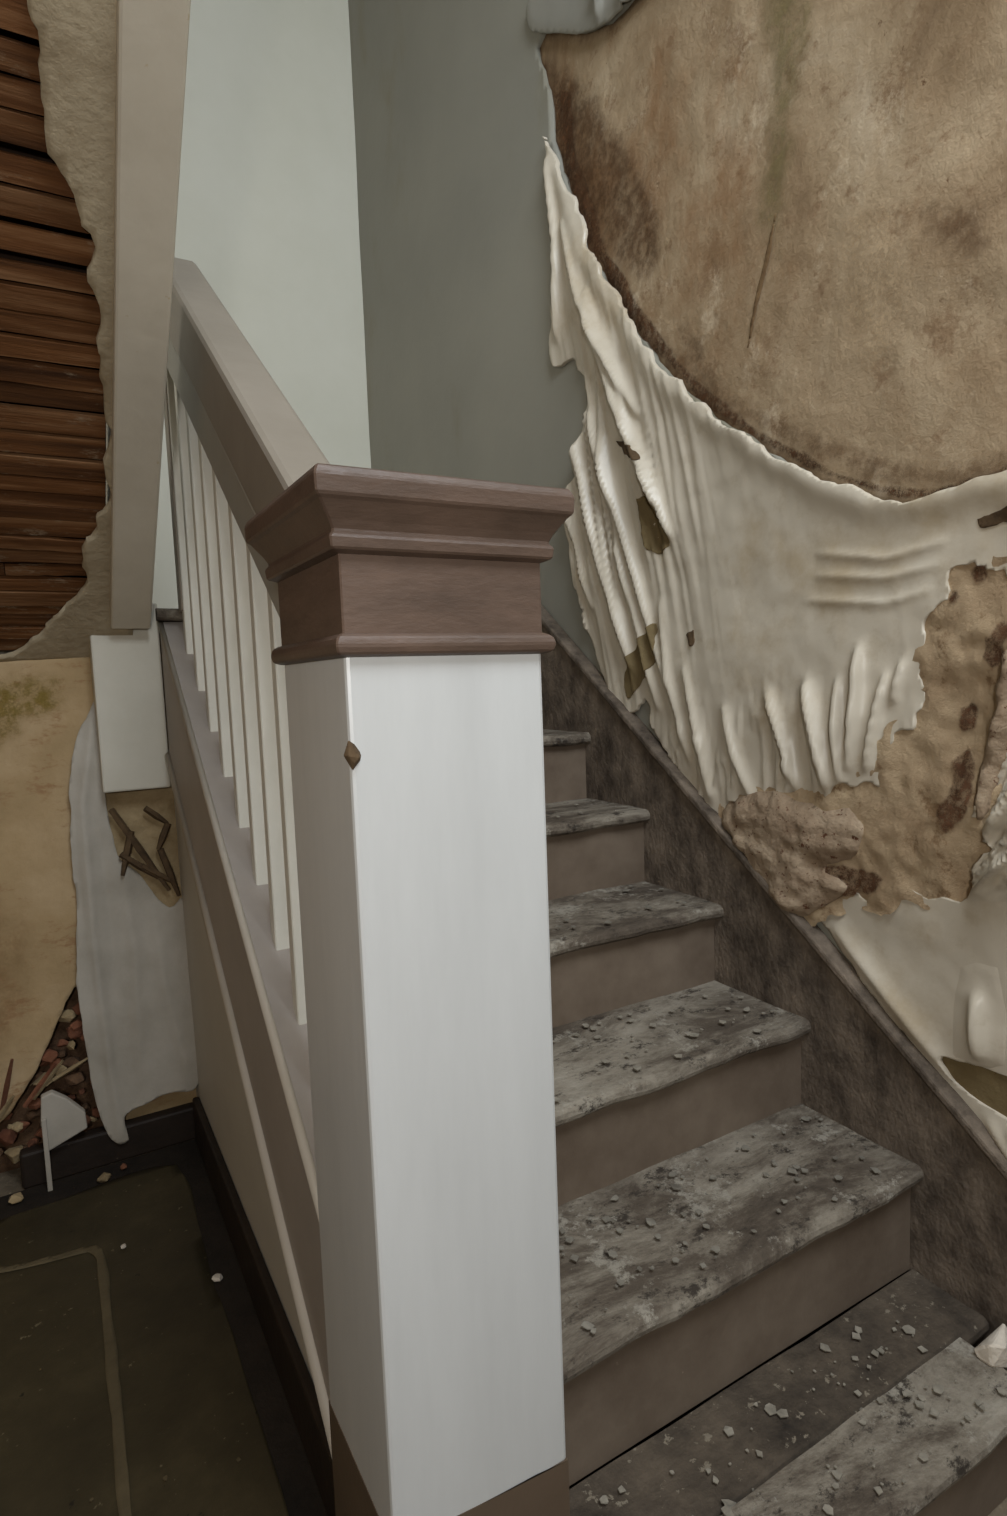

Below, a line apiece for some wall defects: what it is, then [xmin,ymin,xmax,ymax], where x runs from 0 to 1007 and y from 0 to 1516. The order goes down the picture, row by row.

spalling [0,28,40,47]
spalling [0,141,56,164]
spalling [0,181,75,200]
spalling [0,215,93,240]
spalling [0,249,88,274]
spalling [0,330,97,346]
spalling [0,401,105,415]
crack [977,506,1007,528]
spalling [0,562,87,578]
flaking render [526,0,1007,1159]
peeling [0,701,198,1164]